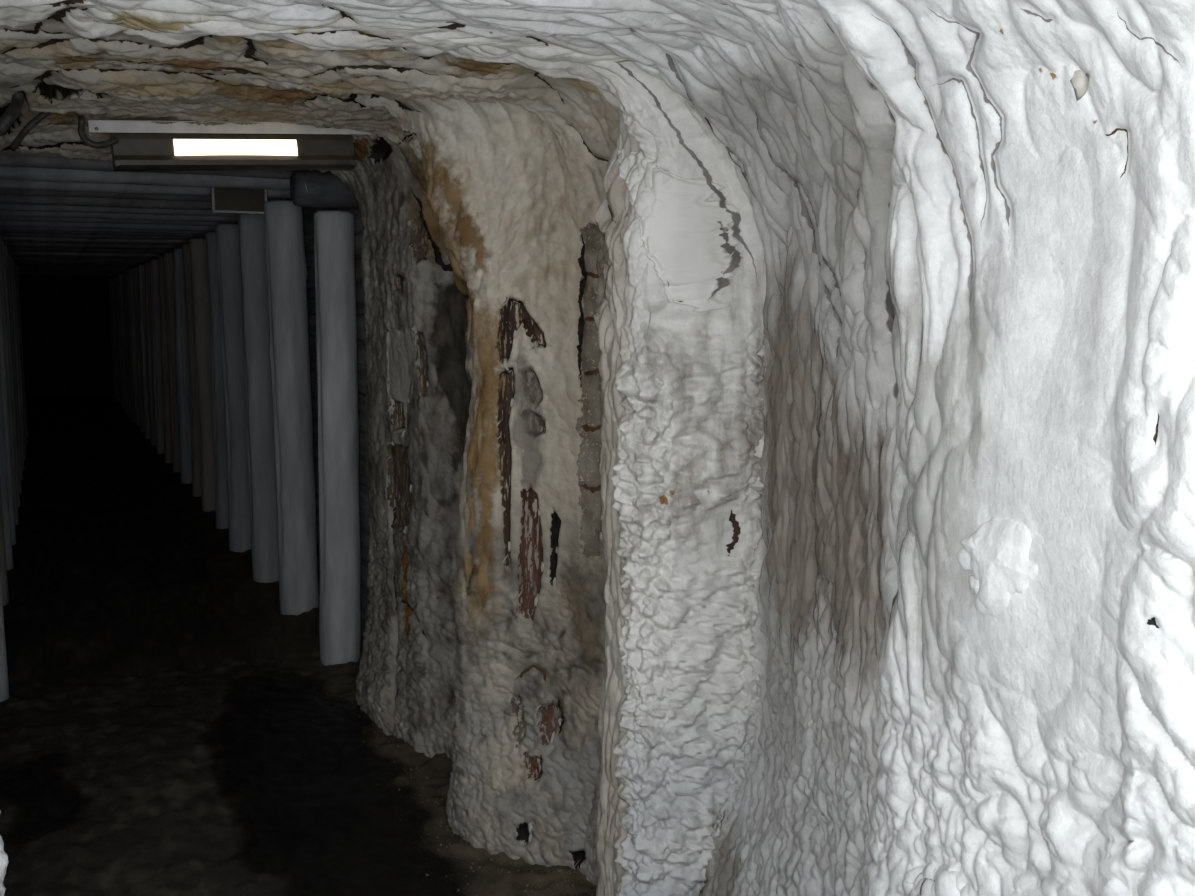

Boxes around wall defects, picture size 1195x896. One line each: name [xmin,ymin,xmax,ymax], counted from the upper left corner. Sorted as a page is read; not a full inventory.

damp [430,282,472,469]
spalling [495,297,558,620]
spalling [575,222,612,557]
crack [667,221,741,302]
damp [719,261,886,678]
damp [899,279,981,685]